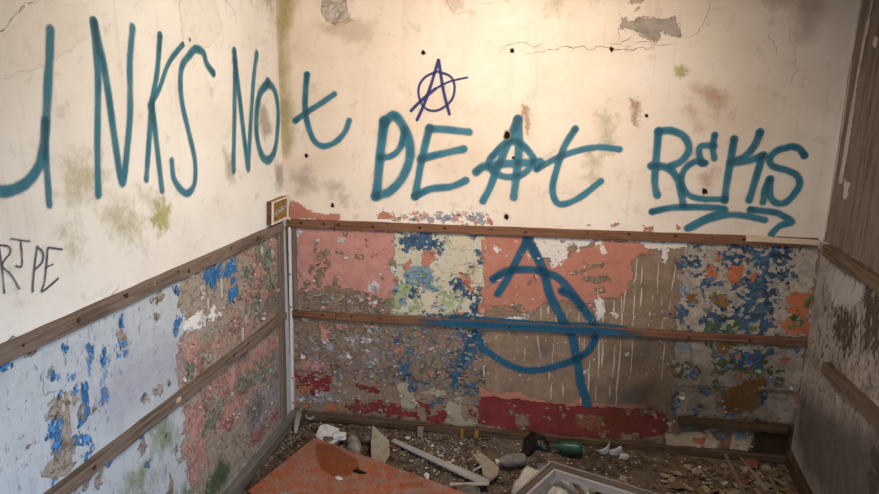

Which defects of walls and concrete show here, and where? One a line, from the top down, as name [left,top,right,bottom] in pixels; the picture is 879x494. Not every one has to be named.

peeling [179,0,222,48]
crack [498,5,717,54]
spalling [619,0,682,42]